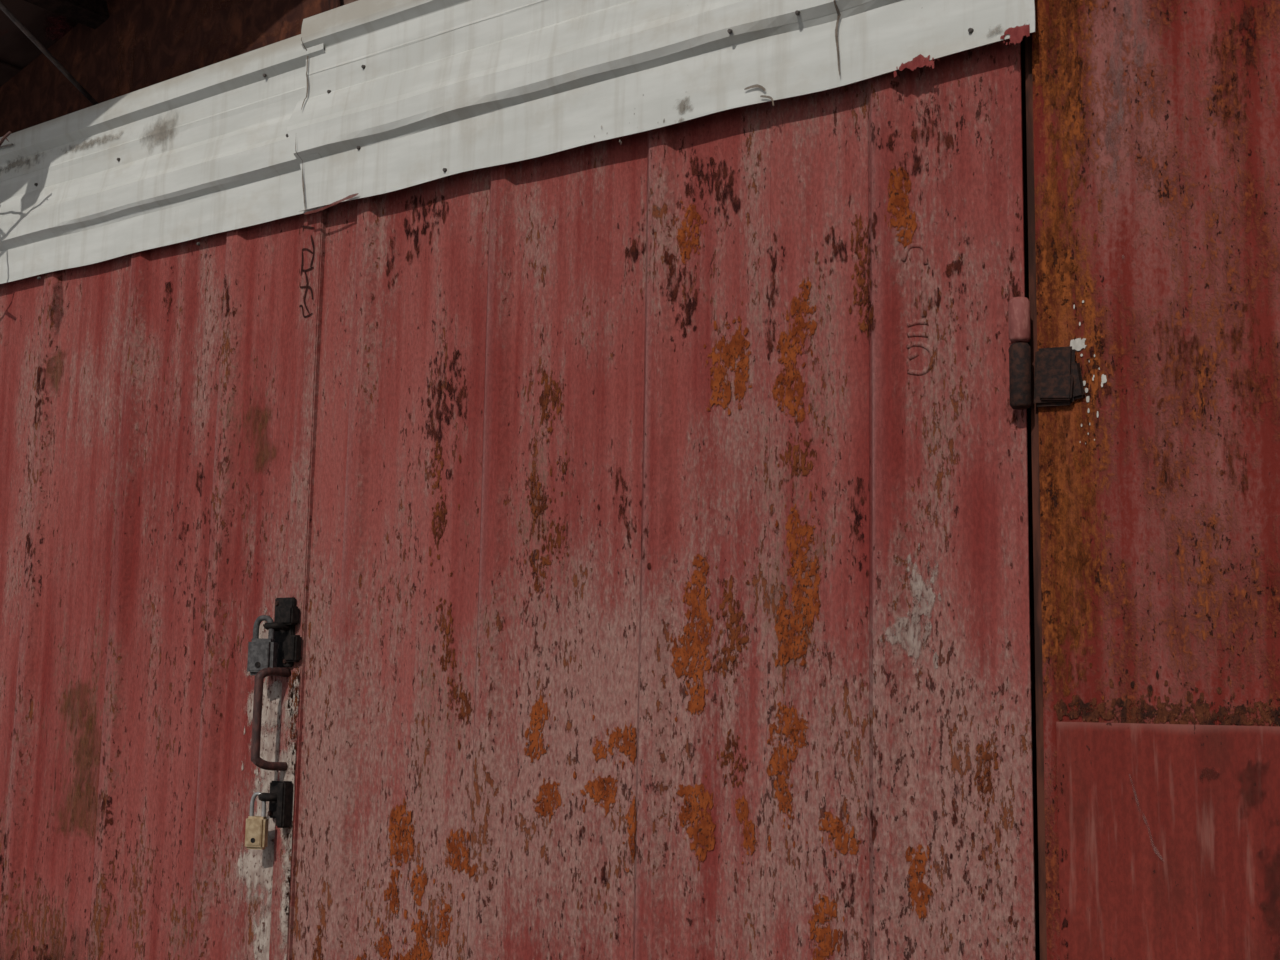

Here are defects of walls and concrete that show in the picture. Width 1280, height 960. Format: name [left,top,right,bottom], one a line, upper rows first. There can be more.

rust [848,167,917,340]
rust [704,295,752,415]
peeling [237,675,299,960]
rust [340,798,478,960]
rust [424,335,475,760]
rust [524,693,556,763]
rust [532,715,637,872]
rust [670,552,750,722]
rust [717,701,861,864]
rust [772,277,821,671]
peeling [880,543,941,673]
rust [1053,670,1280,727]